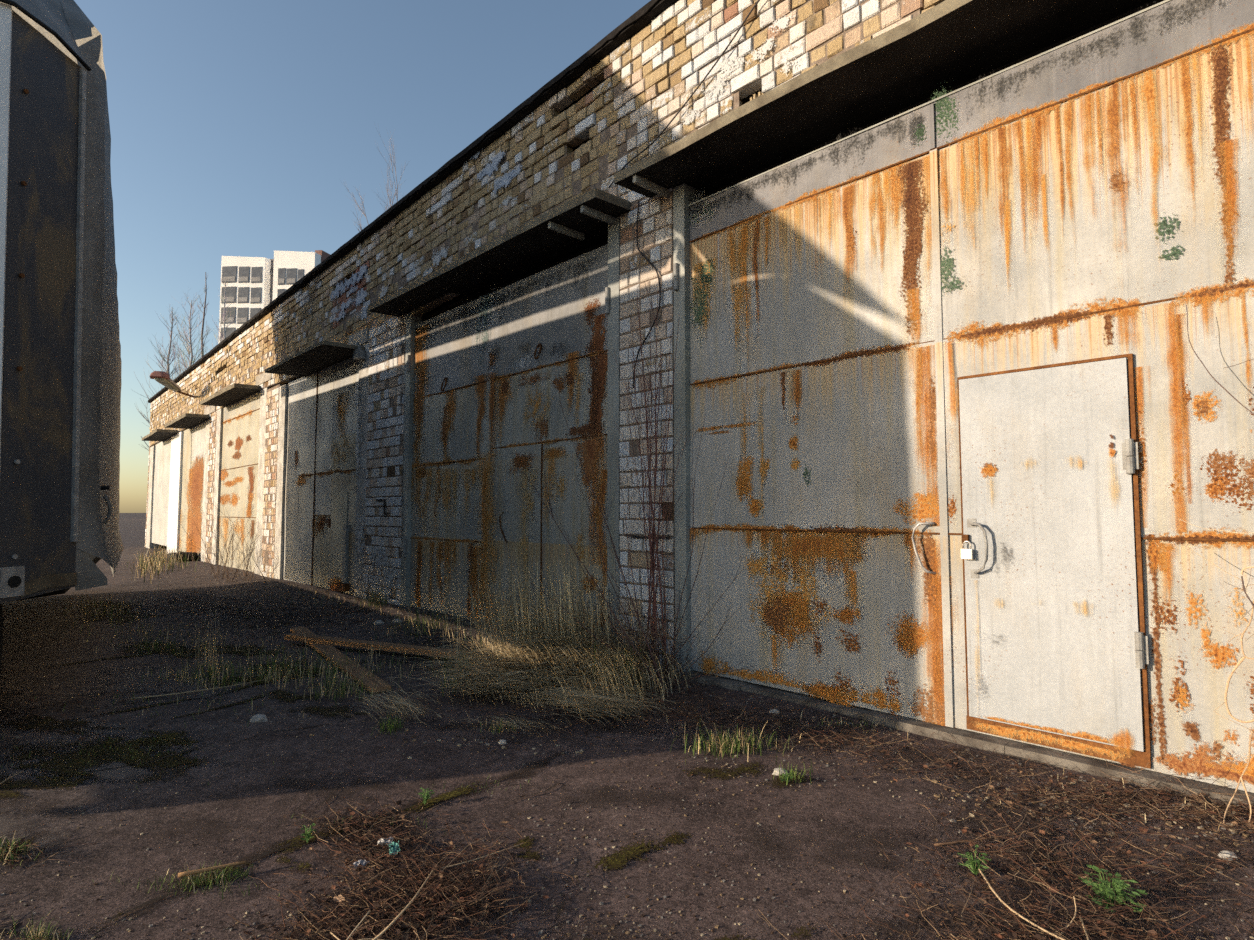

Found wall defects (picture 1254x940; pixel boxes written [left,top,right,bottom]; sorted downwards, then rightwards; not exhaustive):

rust [410,295,608,627]
rust [689,23,1254,785]